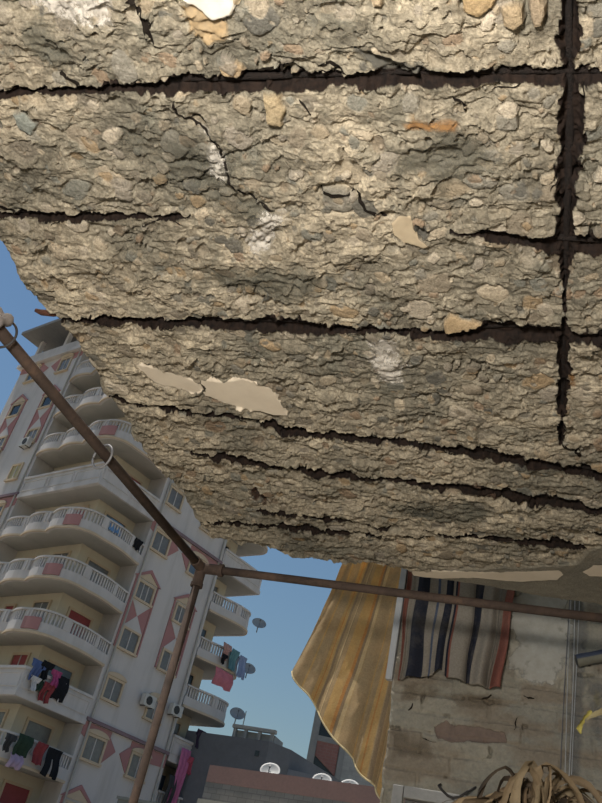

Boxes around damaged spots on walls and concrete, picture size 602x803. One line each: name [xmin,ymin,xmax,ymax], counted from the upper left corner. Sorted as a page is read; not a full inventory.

spalling [182,0,241,45]
corrosion [406,121,458,131]
crack [0,0,602,482]
spalling [392,216,427,249]
water stain [367,340,408,383]
spalling [434,721,507,743]